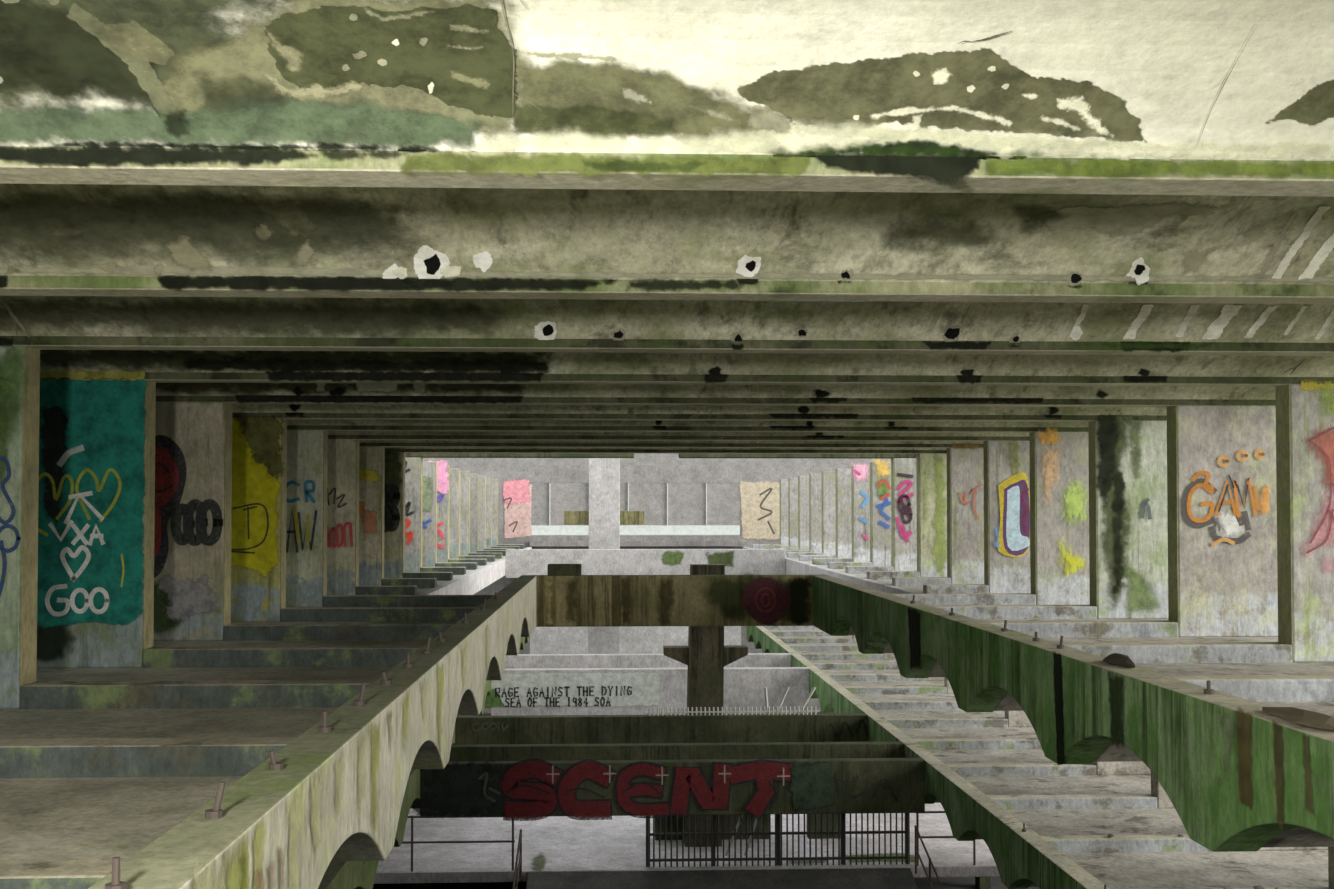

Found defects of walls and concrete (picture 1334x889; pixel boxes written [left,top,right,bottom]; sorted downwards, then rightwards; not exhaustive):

peeling [265,3,517,118]
water stain [0,0,1334,186]
peeling [737,48,1146,142]
peeling [1266,80,1334,125]
spalling [382,245,493,287]
spalling [736,255,762,285]
spalling [1126,257,1150,285]
water stain [1097,415,1158,610]
water stain [37,624,73,661]
water stain [908,608,921,669]
water stain [1053,652,1065,765]
water stain [1108,673,1124,747]